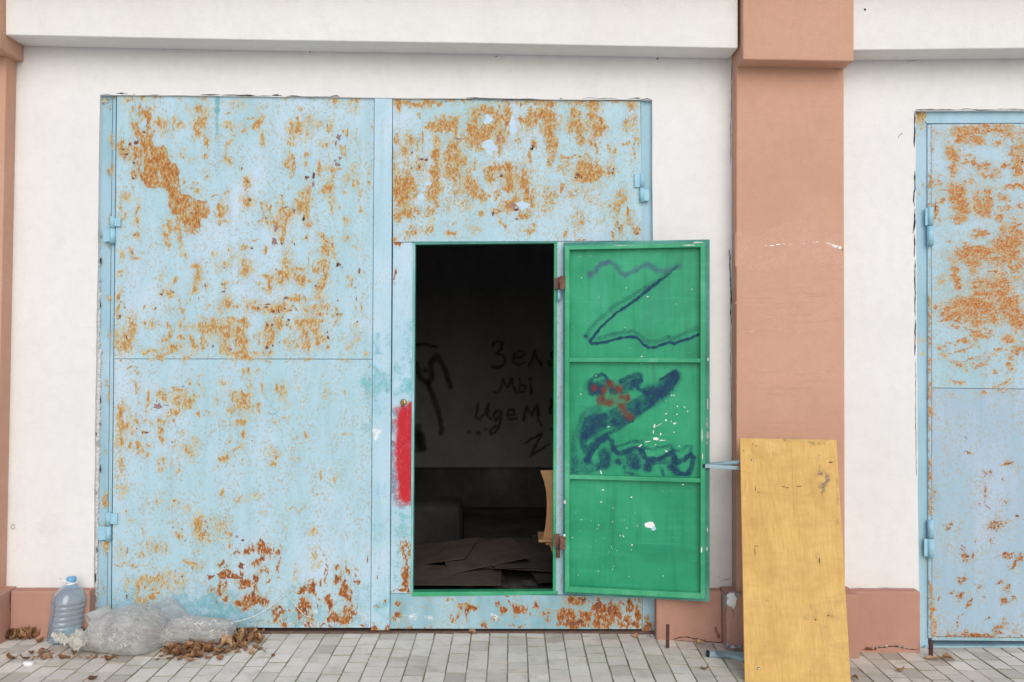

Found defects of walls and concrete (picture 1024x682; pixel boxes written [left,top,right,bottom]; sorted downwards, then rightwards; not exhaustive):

rust [100,96,653,631]
rust [915,112,1024,531]
rust [929,460,1024,641]